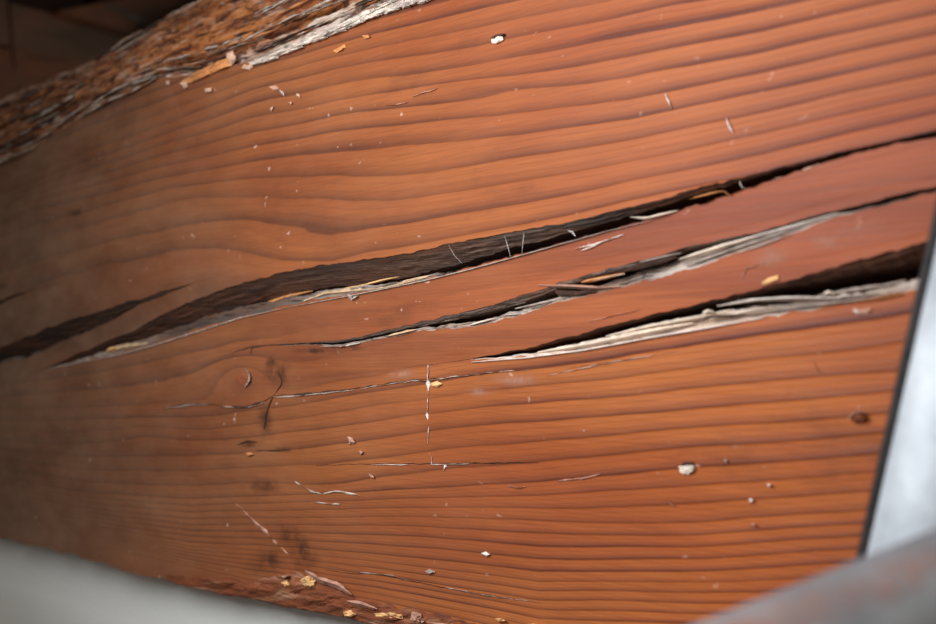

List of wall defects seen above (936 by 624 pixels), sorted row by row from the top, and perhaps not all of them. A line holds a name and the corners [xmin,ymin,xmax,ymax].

crack [0,130,936,372]
crack [167,241,927,452]